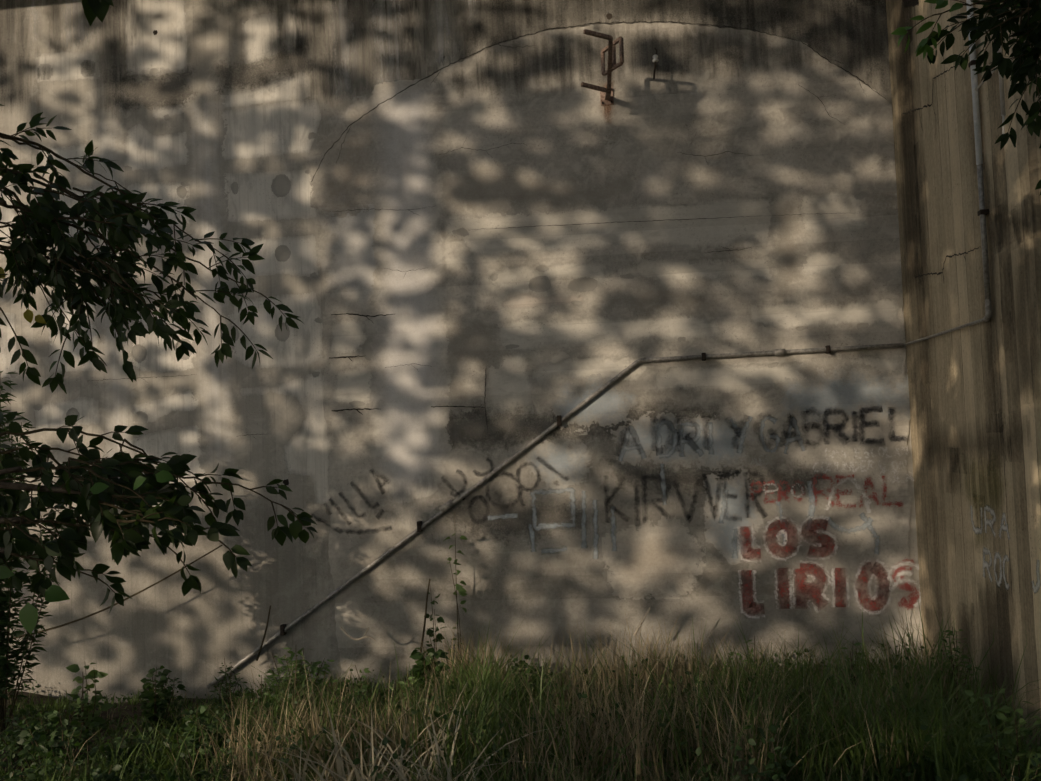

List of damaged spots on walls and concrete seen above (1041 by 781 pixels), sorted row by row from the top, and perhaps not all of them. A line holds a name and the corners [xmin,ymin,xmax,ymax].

water stain [0,0,35,103]
water stain [53,0,88,43]
crack [311,21,883,182]
crack [901,64,960,130]
water stain [102,0,734,505]
crack [914,247,979,283]